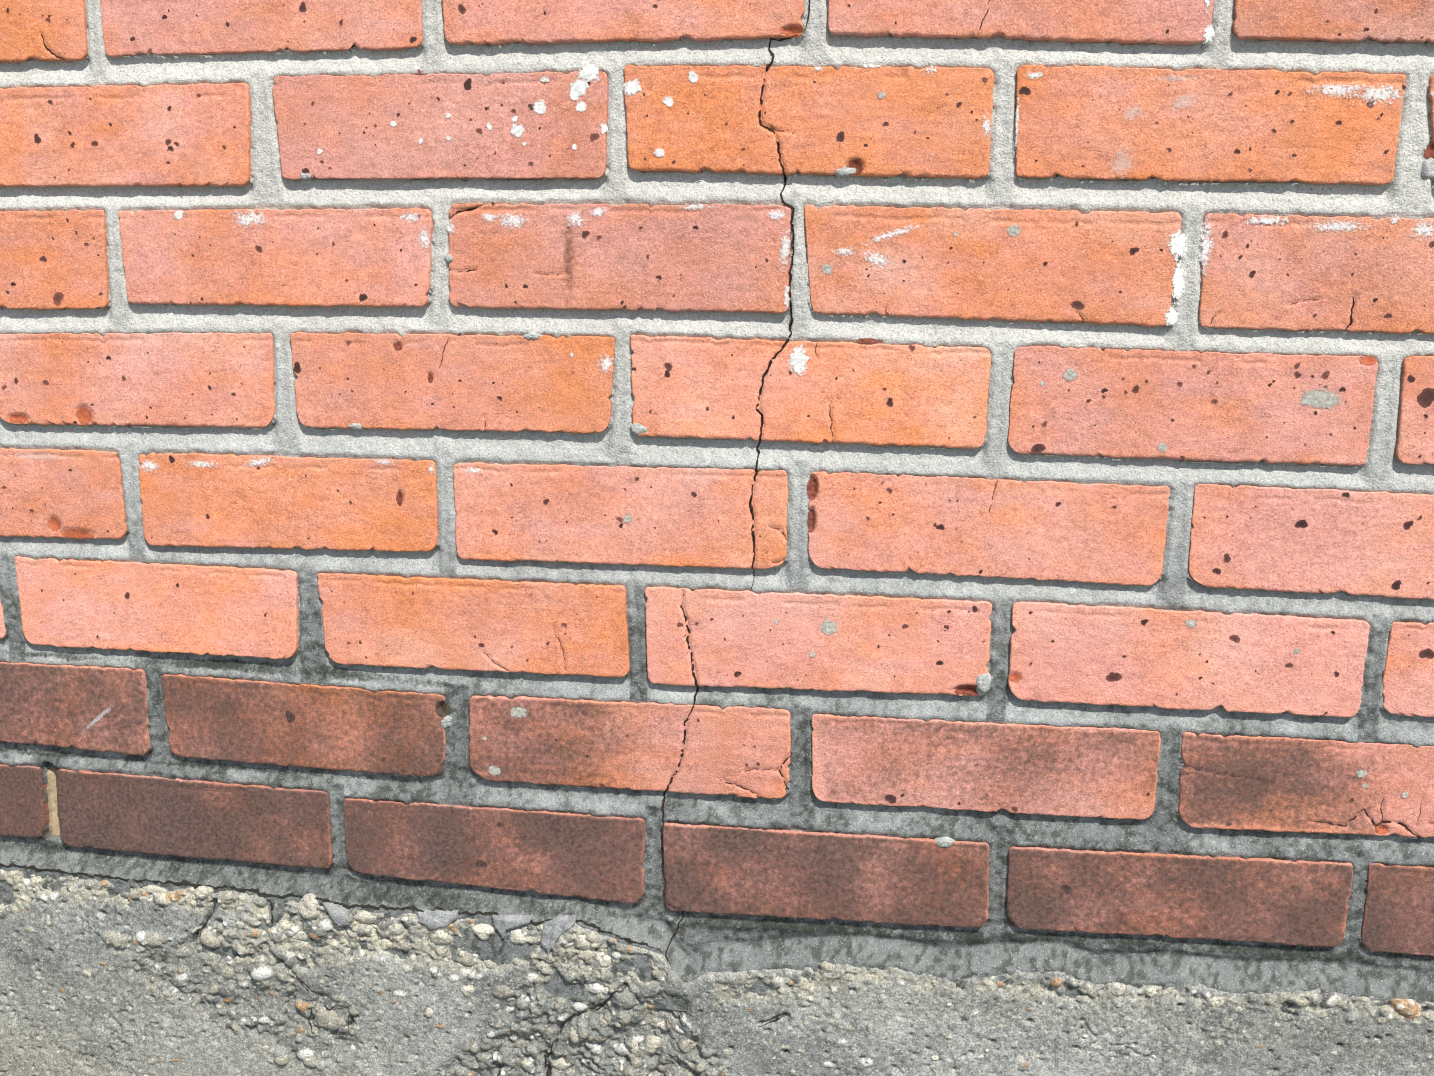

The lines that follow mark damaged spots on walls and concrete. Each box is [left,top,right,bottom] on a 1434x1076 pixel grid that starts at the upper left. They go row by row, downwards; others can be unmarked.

crack [749,0,818,589]
water stain [0,652,645,915]
crack [725,753,793,799]
water stain [904,723,1155,794]
water stain [1181,736,1362,829]
water stain [663,827,988,944]
water stain [1002,849,1434,963]
spalling [0,870,707,1076]
crack [544,986,627,1076]